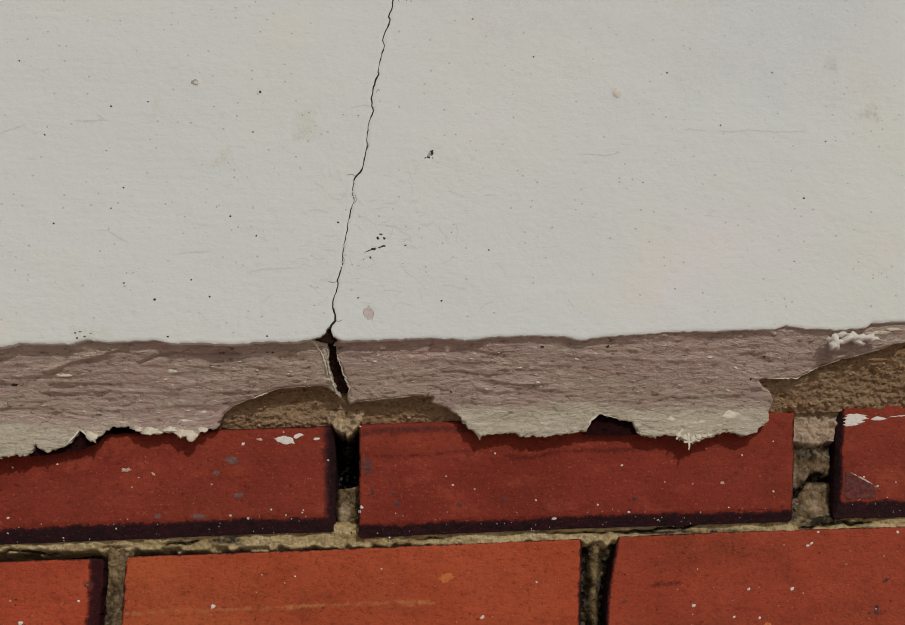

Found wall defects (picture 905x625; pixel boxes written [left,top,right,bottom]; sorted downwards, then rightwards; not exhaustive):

crack [247,0,494,397]
spalling [750,328,905,414]
spalling [30,382,461,457]
spalling [583,412,637,435]
peeling [665,416,713,450]
peeling [722,410,740,419]